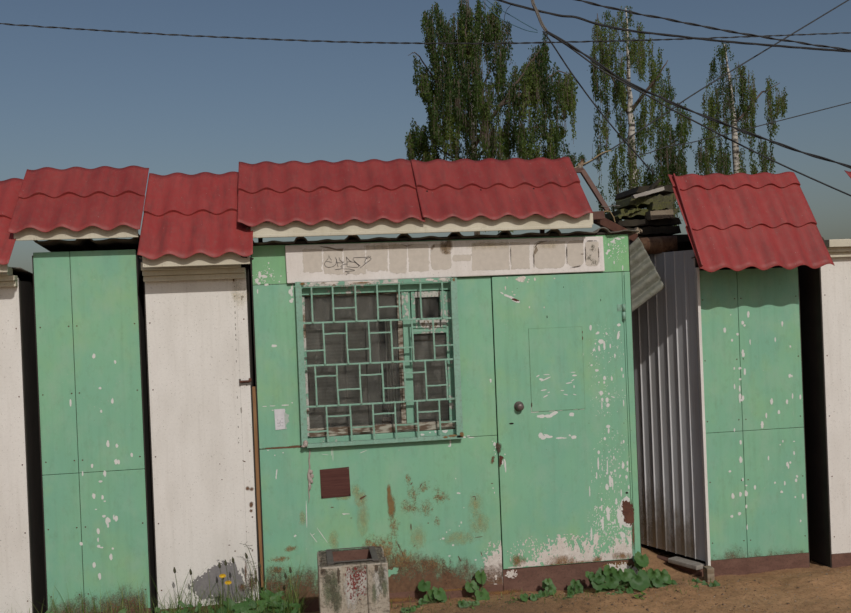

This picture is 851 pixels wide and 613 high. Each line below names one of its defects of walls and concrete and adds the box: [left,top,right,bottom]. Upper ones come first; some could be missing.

peeling [475,322,638,585]
peeling [95,509,118,560]
corrosion [366,484,522,602]
corrosion [622,492,635,545]
corrosion [240,546,319,601]